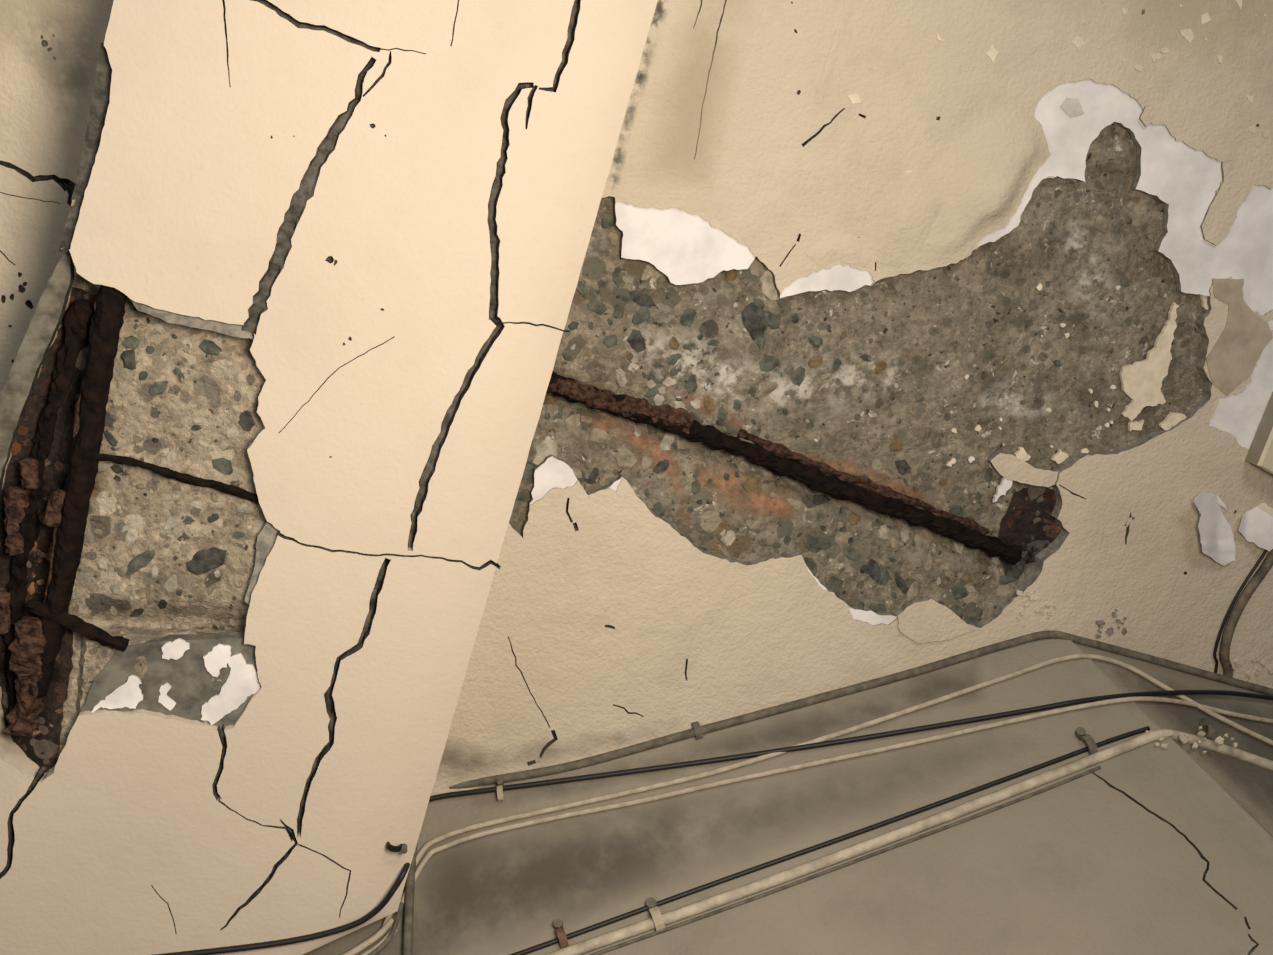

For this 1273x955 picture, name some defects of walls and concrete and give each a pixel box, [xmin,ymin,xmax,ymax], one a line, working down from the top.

crack [0,160,75,206]
spalling [0,43,112,617]
spalling [509,79,1273,644]
spalling [0,297,280,773]
crack [212,0,581,930]
rust [703,472,792,515]
rust [811,458,915,497]
crack [0,766,46,879]
crack [151,885,176,933]
crack [1092,772,1259,955]